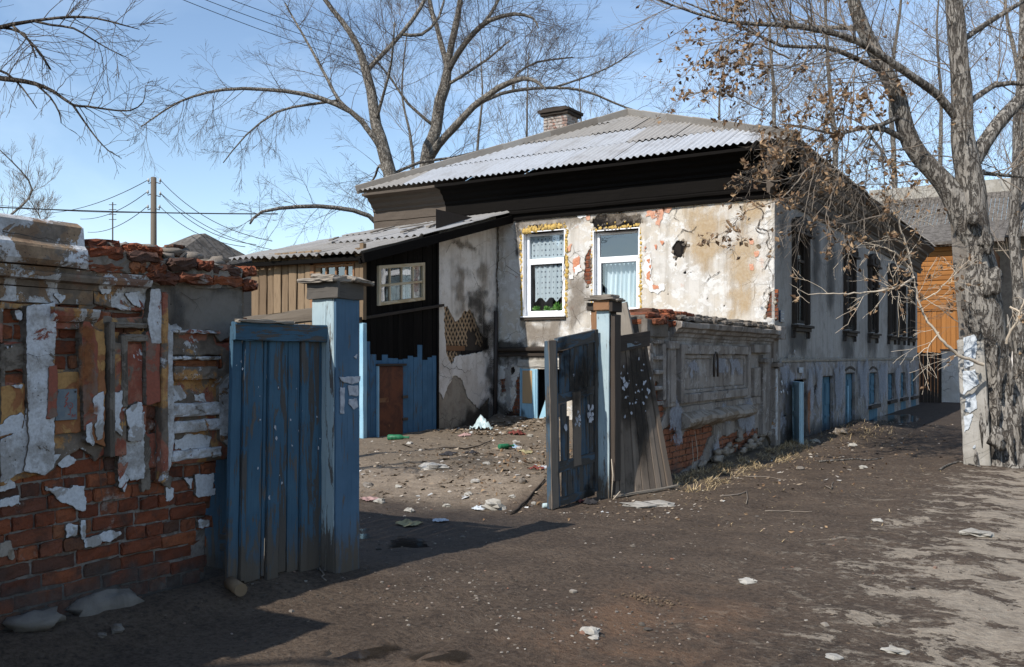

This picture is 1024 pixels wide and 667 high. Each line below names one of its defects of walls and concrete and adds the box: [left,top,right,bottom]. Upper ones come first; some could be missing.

spalling [577,207,672,232]
spalling [567,244,592,288]
peeling [643,238,690,295]
peeling [124,291,141,308]
spalling [444,307,483,363]
peeling [0,412,24,436]
peeling [54,454,76,468]
peeling [81,391,216,501]
spalling [655,382,759,474]
peeling [0,478,20,507]
peeling [44,485,122,548]
peeling [0,540,15,560]